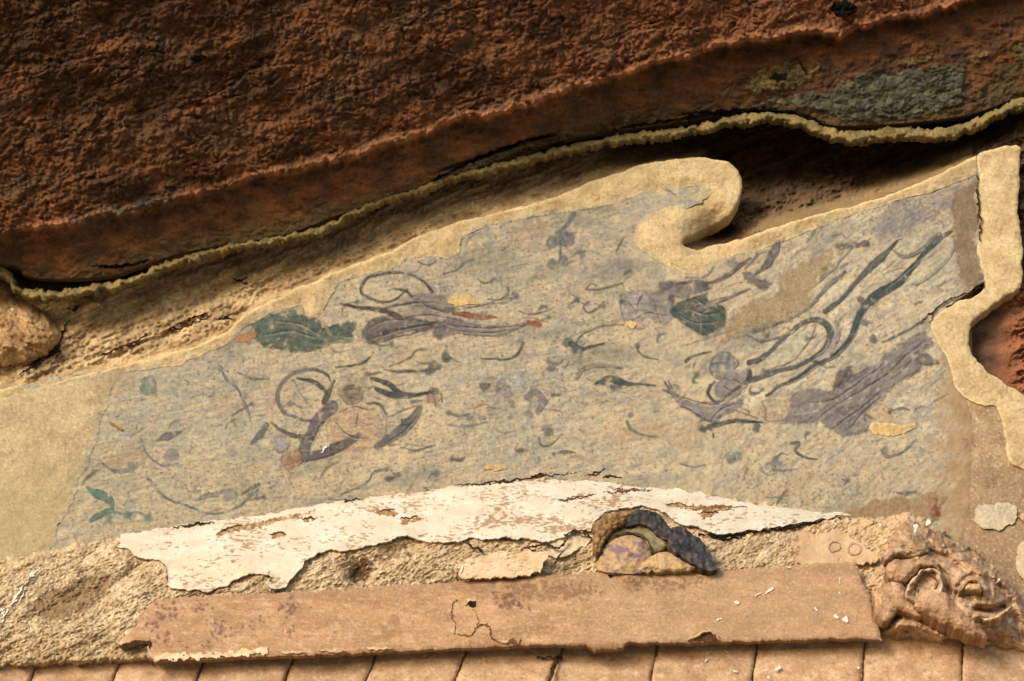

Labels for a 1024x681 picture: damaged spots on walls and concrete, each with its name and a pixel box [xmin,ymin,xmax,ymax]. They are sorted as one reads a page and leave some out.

crack [457,468,652,502]
flaking render [118,479,946,593]
crack [450,599,563,681]